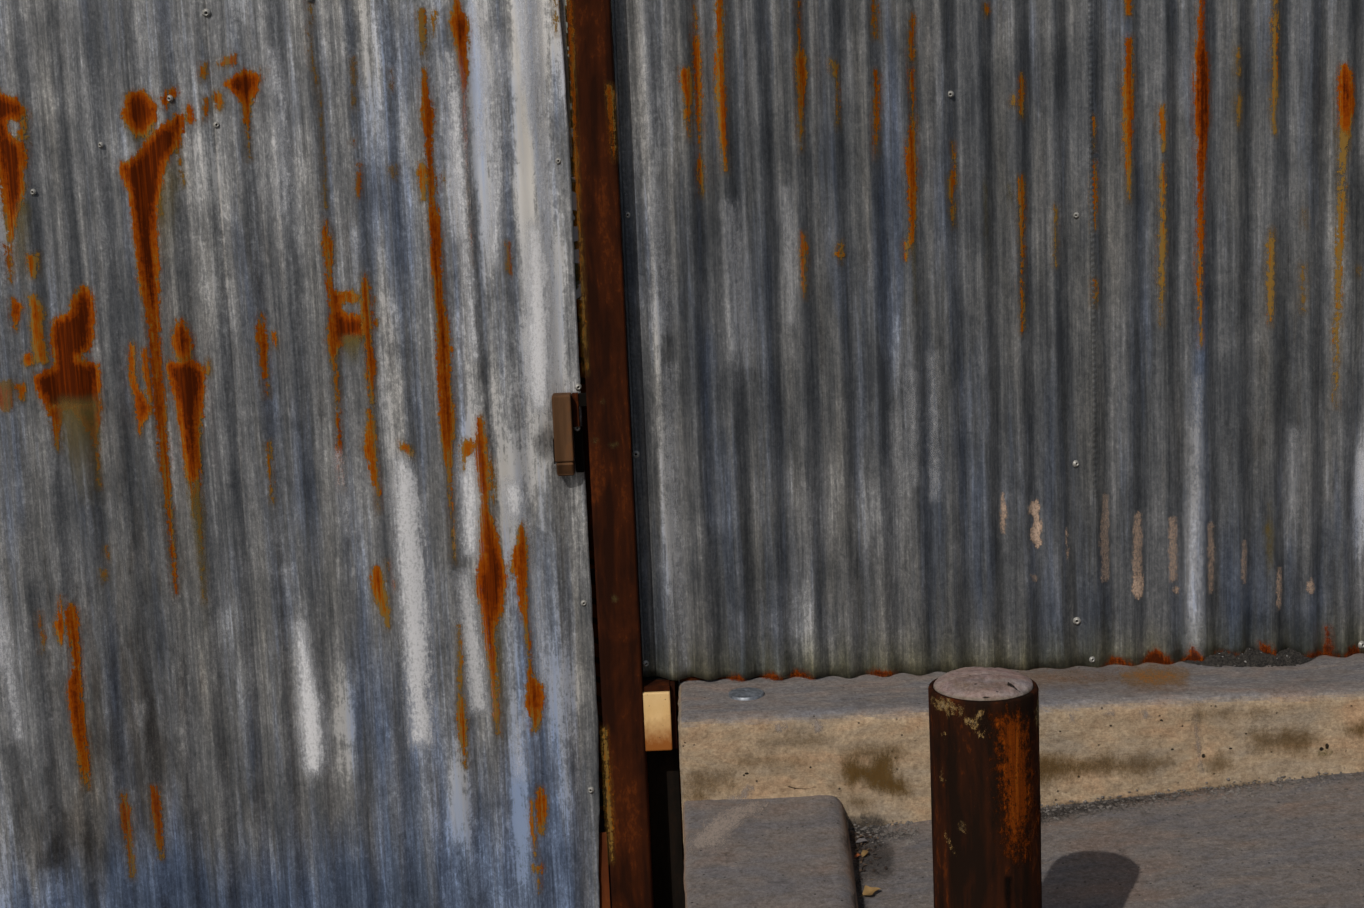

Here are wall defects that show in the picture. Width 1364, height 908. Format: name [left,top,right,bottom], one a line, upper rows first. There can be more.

corrosion [0,92,103,486]
corrosion [119,53,270,600]
corrosion [255,313,277,395]
corrosion [265,441,275,503]
corrosion [305,3,382,512]
corrosion [415,0,545,736]
corrosion [1192,0,1211,347]
corrosion [1332,63,1362,403]
corrosion [38,595,91,791]
corrosion [456,624,468,769]
corrosion [602,727,615,861]